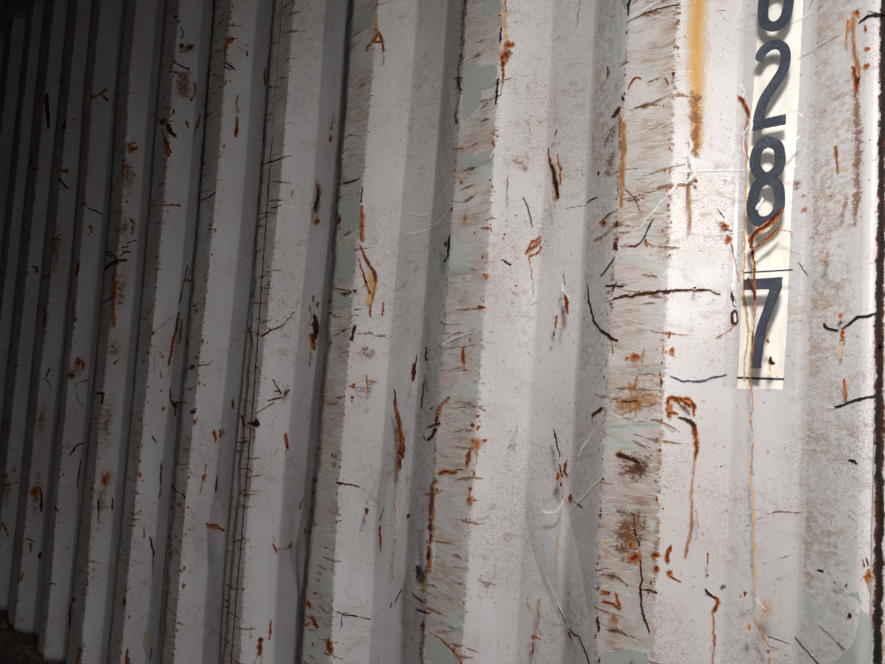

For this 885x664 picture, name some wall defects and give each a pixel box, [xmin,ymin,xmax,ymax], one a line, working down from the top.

peeling [460,61,498,121]
corrosion [673,0,706,157]
corrosion [309,295,328,366]
peeling [332,194,360,281]
corrosion [333,186,385,342]
corrosion [421,407,487,572]
corrosion [597,503,681,597]
corrosion [604,331,700,558]
corrosion [862,120,885,664]